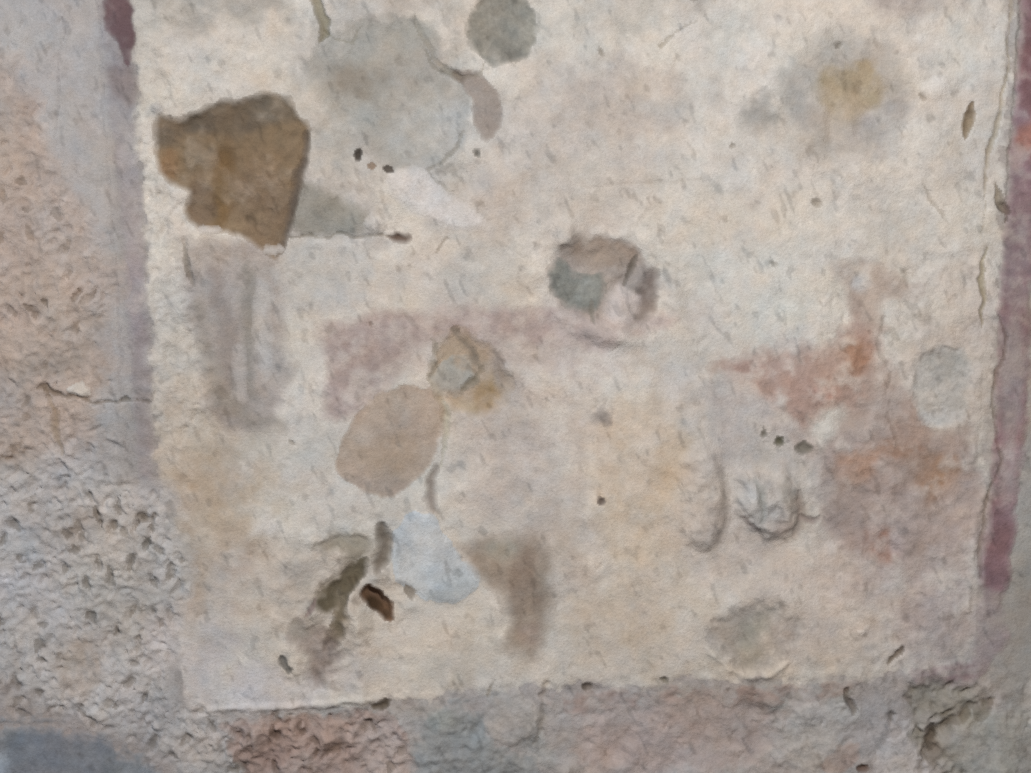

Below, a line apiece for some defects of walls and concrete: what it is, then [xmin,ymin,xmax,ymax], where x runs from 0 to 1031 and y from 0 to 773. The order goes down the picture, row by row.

spalling [0,41,416,773]
crack [309,0,363,45]
crack [924,186,951,225]
crack [976,0,1014,579]